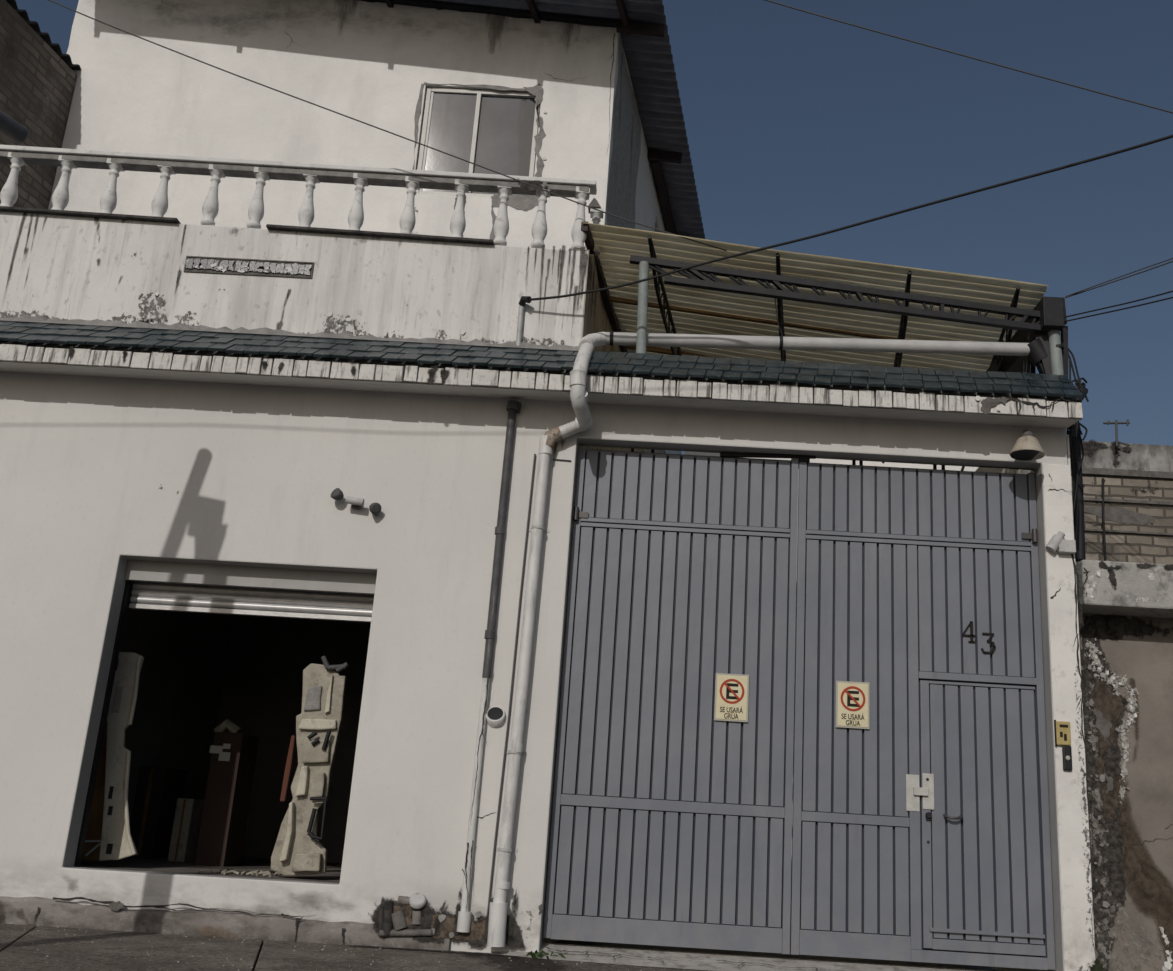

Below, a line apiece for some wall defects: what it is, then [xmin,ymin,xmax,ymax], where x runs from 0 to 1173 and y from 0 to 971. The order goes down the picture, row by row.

flaking render [413,82,547,240]
damp [6,213,47,287]
peeling [0,296,68,321]
peeling [106,292,200,326]
peeling [299,311,404,339]
peeling [481,337,566,346]
damp [526,245,596,314]
damp [1076,572,1173,971]
flaking render [1074,666,1173,971]
flaking render [430,911,486,940]